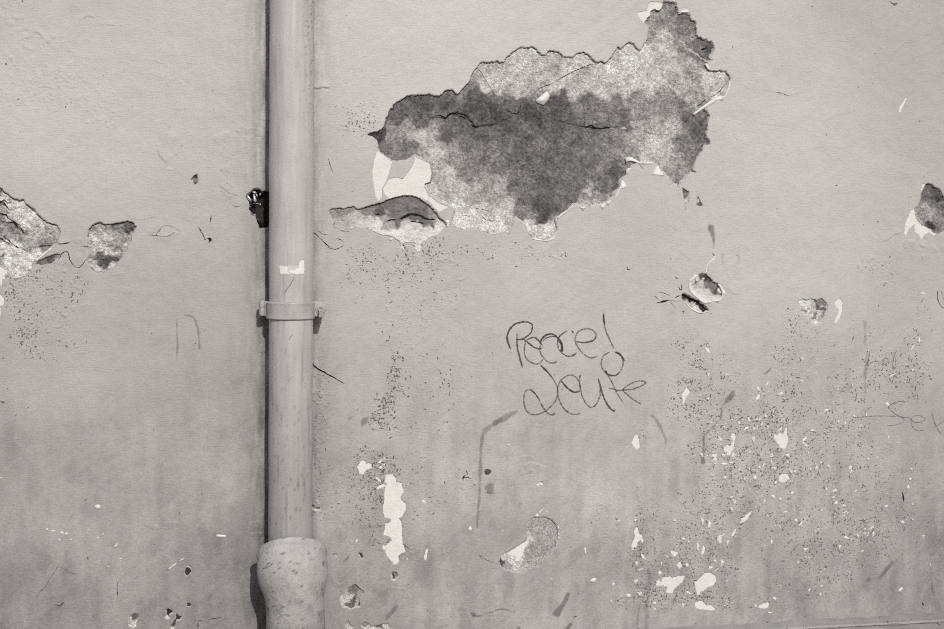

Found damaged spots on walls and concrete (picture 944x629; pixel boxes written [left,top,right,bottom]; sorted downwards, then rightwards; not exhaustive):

spalling [328,0,731,255]
spalling [904,183,944,239]
spalling [0,187,61,316]
spalling [86,220,137,273]
spalling [681,273,726,314]
spalling [798,298,843,326]
peeling [700,416,796,500]
peeling [376,474,406,581]
spalling [499,505,560,573]
peeling [631,519,642,548]
peeling [701,511,752,548]
peeling [656,538,725,610]